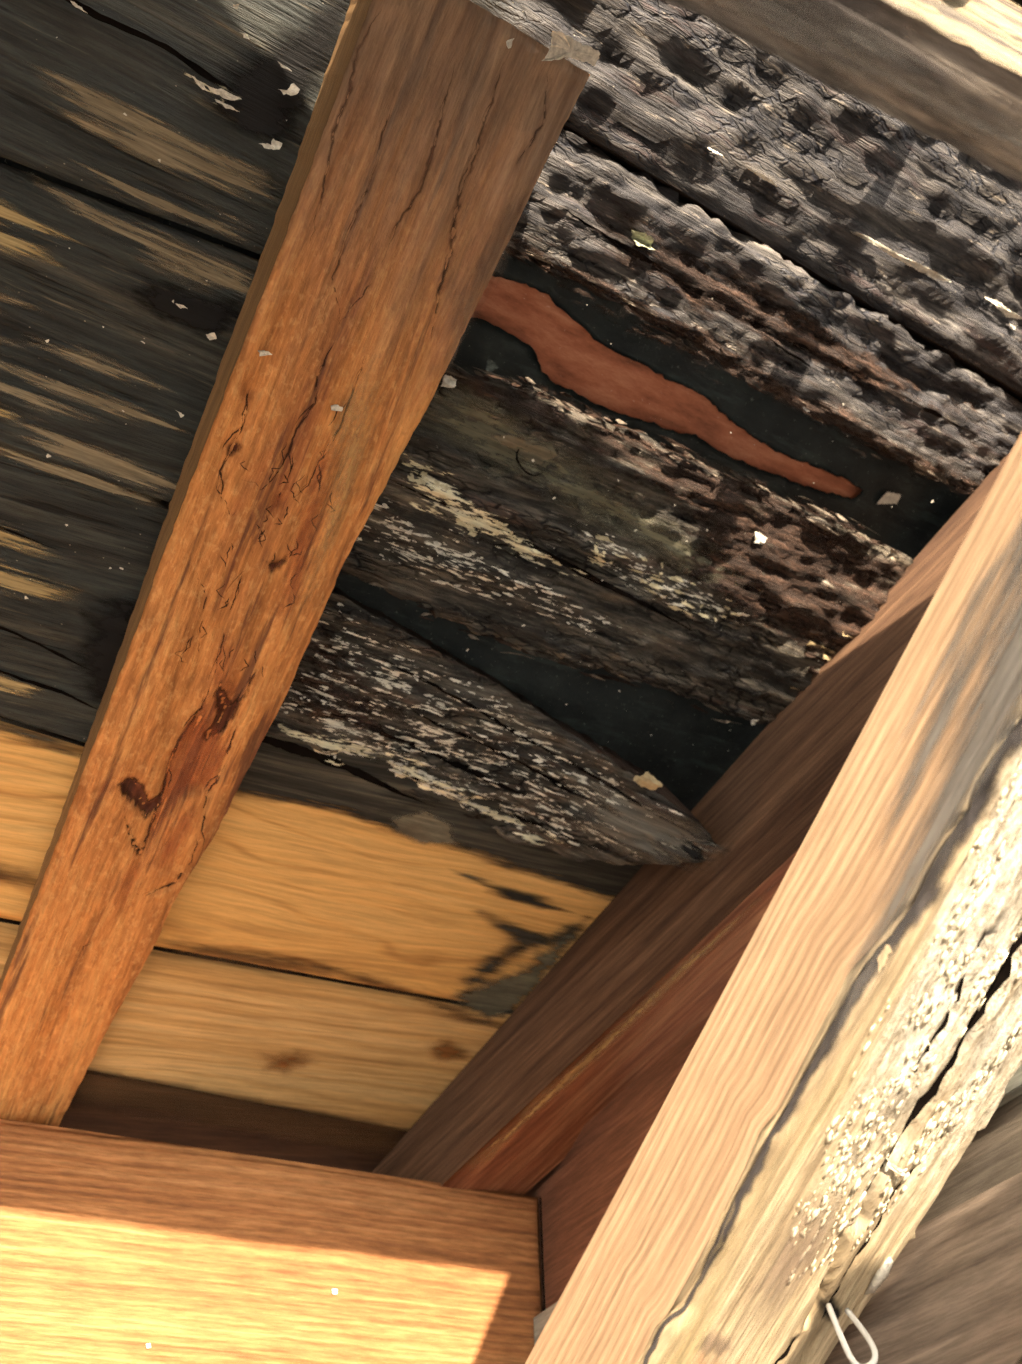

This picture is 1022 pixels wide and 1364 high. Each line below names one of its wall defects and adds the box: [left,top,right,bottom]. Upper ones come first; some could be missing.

peeling [877,491,901,504]
peeling [356,453,750,644]
peeling [754,532,768,544]
damp [0,717,74,755]
peeling [276,603,683,858]
damp [236,733,644,901]
damp [0,870,35,885]
damp [459,874,563,910]
damp [175,945,336,975]
damp [416,912,580,1028]
crack [821,933,1022,1301]